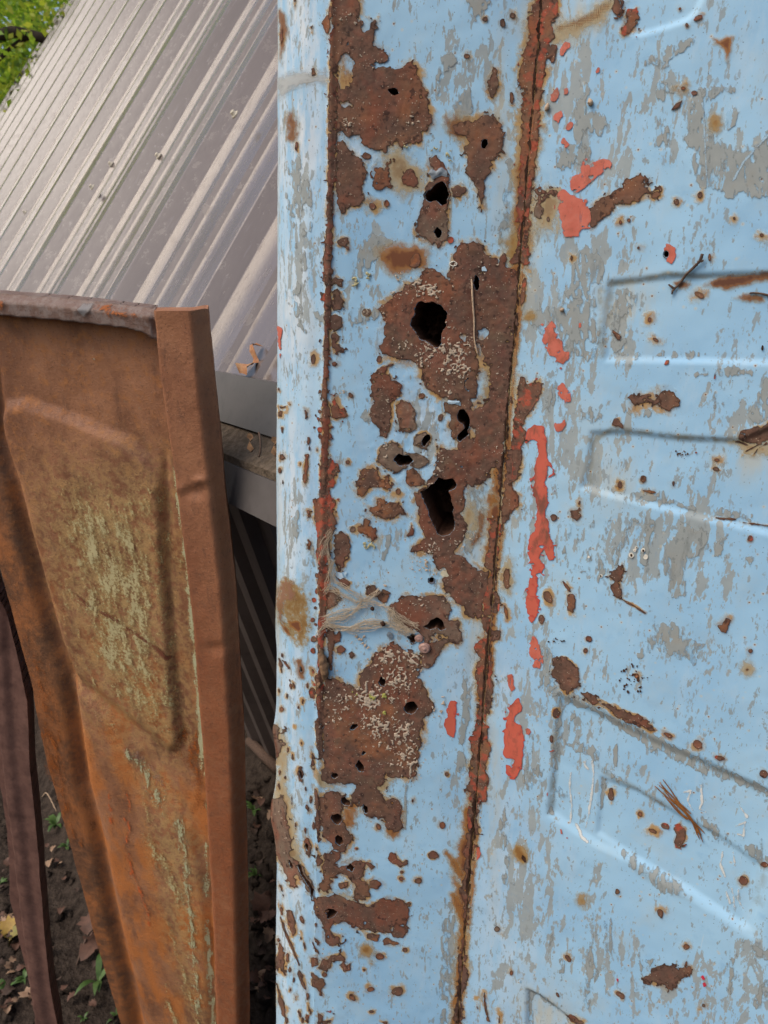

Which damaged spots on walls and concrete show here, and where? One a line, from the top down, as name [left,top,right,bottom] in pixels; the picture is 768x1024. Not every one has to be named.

peeling [683,84,768,199]
peeling [530,82,640,369]
corrosion [628,390,680,414]
peeling [657,350,700,365]
corrosion [270,0,645,1024]
peeling [525,420,566,623]
corrosion [549,656,675,740]
peeling [502,636,768,815]
peeling [499,802,510,884]
corrosion [641,942,693,993]